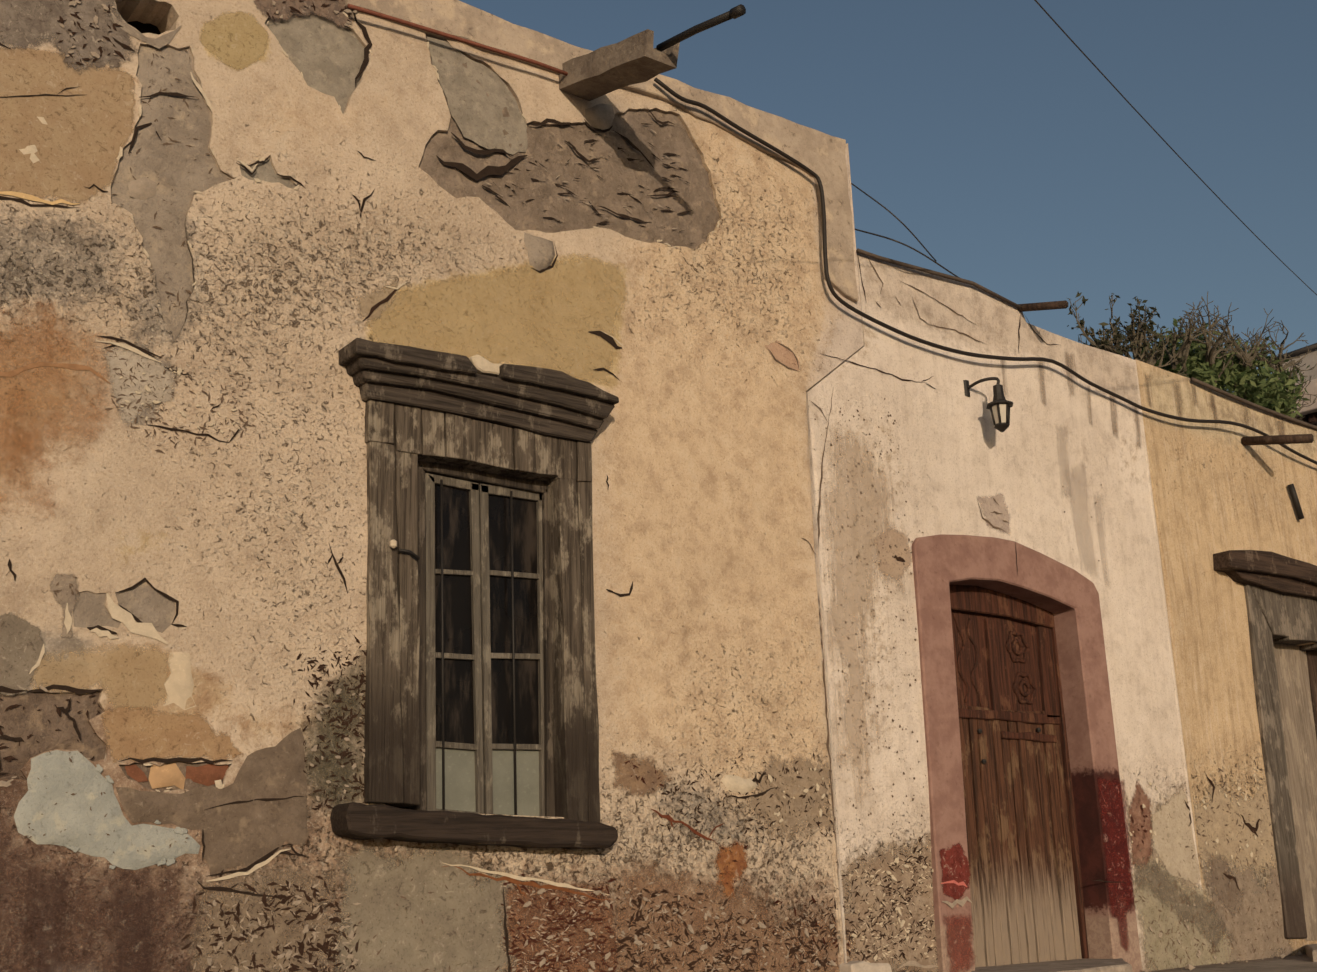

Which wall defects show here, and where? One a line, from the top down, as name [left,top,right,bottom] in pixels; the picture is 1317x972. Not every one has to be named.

peeling [0,0,373,343]
spalling [418,36,723,250]
flaking render [0,574,243,795]
spalling [488,398,974,972]
peeling [137,820,188,866]